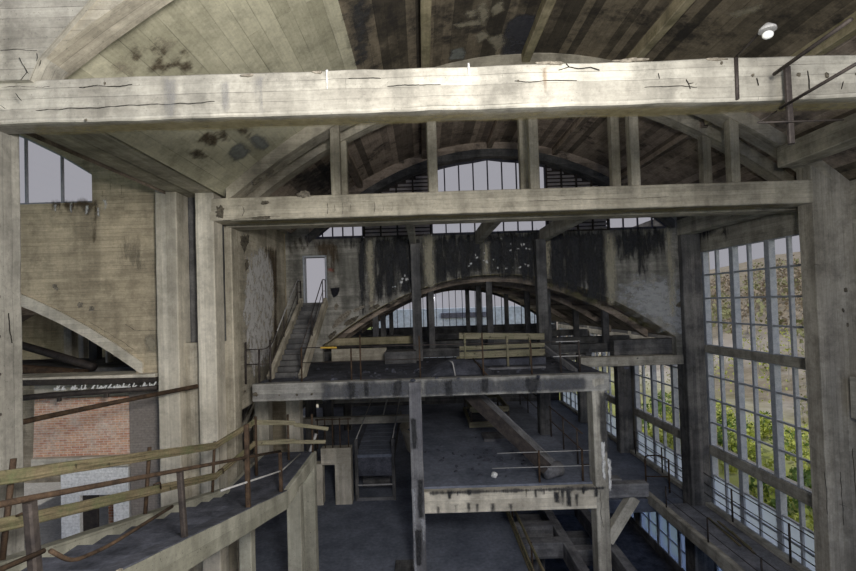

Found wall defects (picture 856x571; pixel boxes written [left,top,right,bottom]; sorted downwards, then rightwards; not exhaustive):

crack [0,49,215,111]
crack [519,63,599,82]
crack [644,73,696,89]
peeling [240,234,274,376]
leakage [358,233,535,314]
leakage [546,229,682,334]
crack [824,449,856,523]